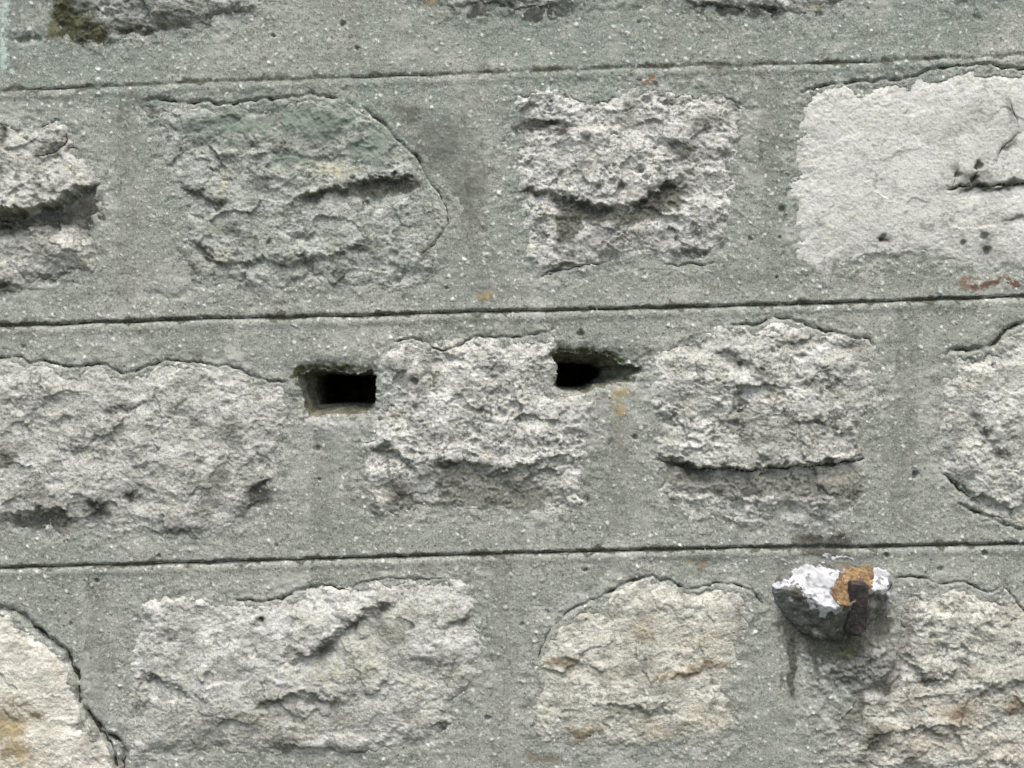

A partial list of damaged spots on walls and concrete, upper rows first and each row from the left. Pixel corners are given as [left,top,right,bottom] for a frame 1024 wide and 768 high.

rust [959,275,1021,291]
rust [830,565,874,607]